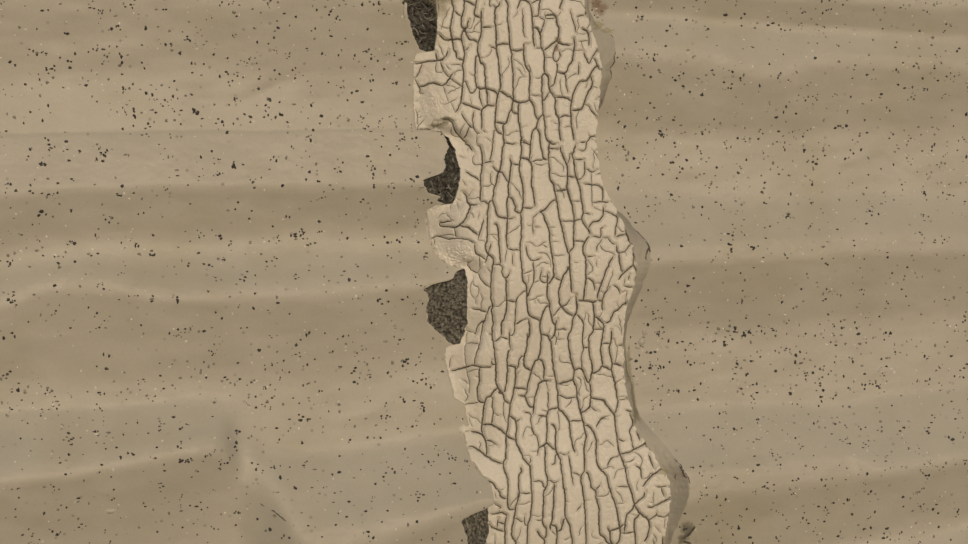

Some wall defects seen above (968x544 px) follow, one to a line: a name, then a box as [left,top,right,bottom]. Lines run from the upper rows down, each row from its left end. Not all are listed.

crack [415,0,669,544]